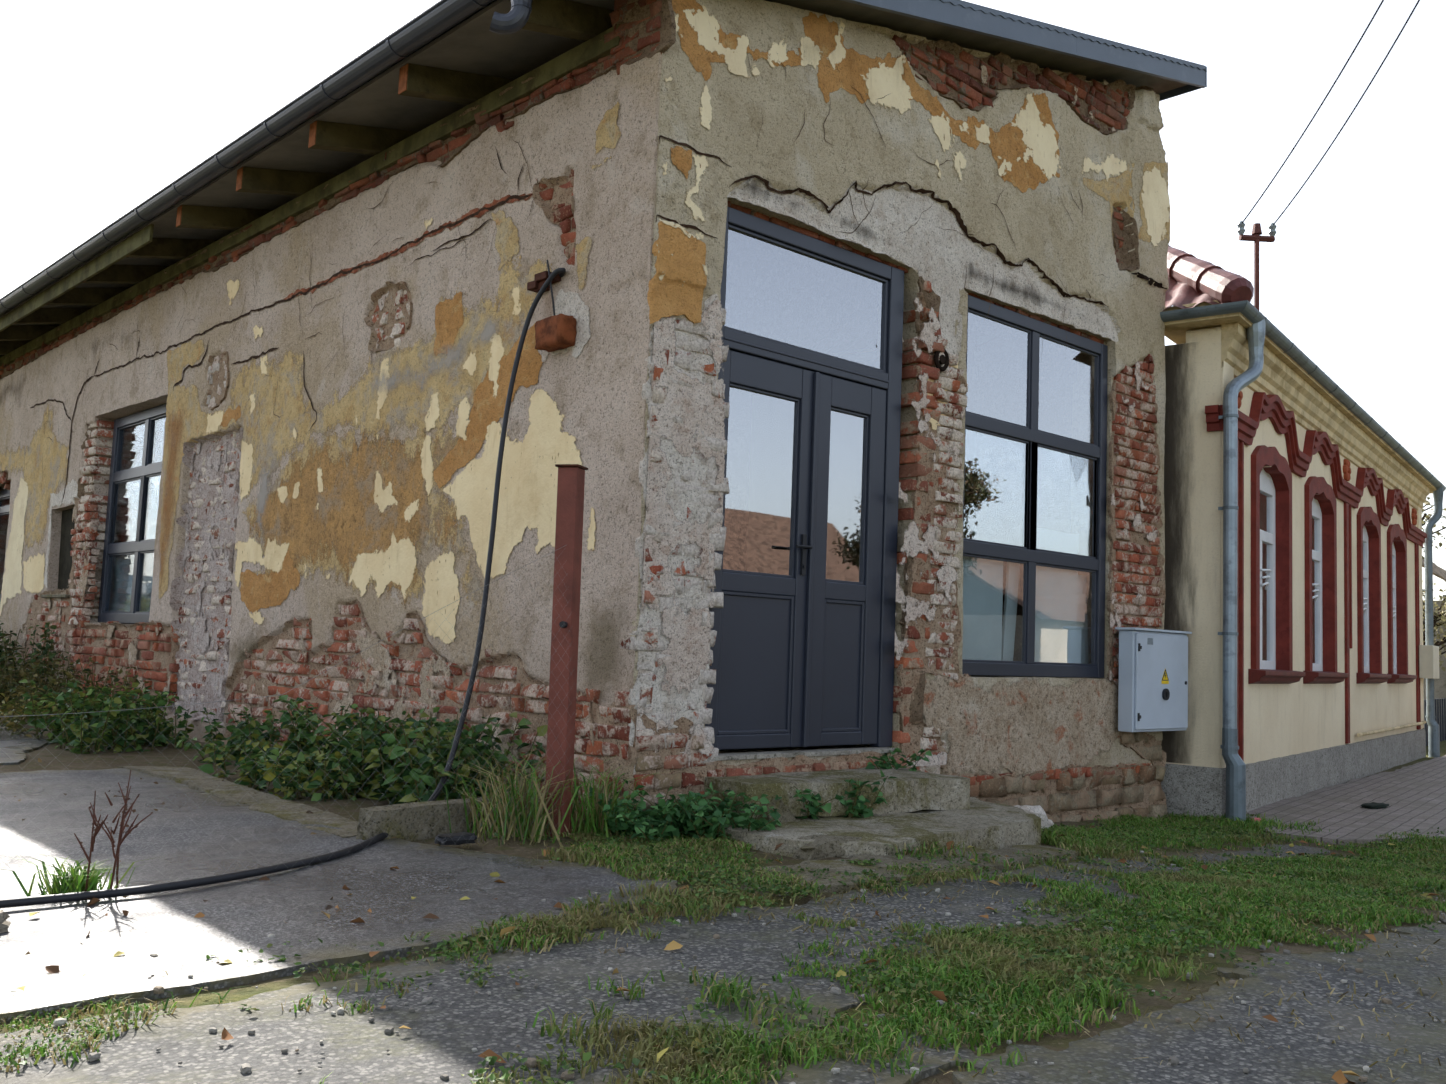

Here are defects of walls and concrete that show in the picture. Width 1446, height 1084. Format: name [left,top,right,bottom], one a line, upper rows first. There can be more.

spalling [204,351,230,435]
crack [5,140,538,501]
spalling [364,281,413,439]
flaking render [0,0,846,379]
peeling [463,333,505,398]
crack [656,215,718,239]
crack [659,135,731,167]
flaking render [572,34,1170,820]
crack [747,54,1016,316]
crack [1053,266,1167,359]
flaking render [0,420,180,709]
flaking render [221,389,582,808]